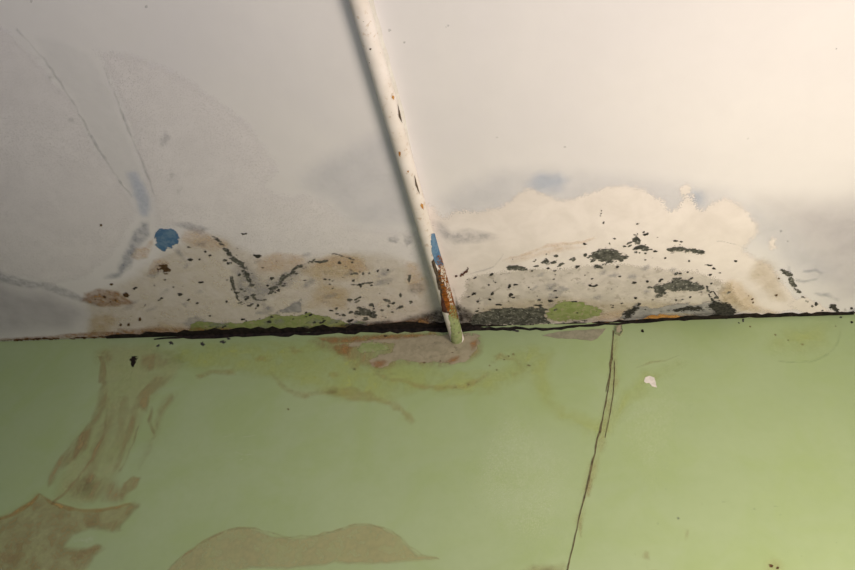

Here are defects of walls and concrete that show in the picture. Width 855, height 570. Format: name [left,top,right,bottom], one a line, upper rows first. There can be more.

peeling [154,228,180,251]
peeling [189,236,413,331]
peeling [431,233,453,313]
spalling [322,284,606,368]
peeling [506,223,715,271]
water stain [427,183,842,324]
peeling [620,272,737,320]
crack [4,269,855,570]